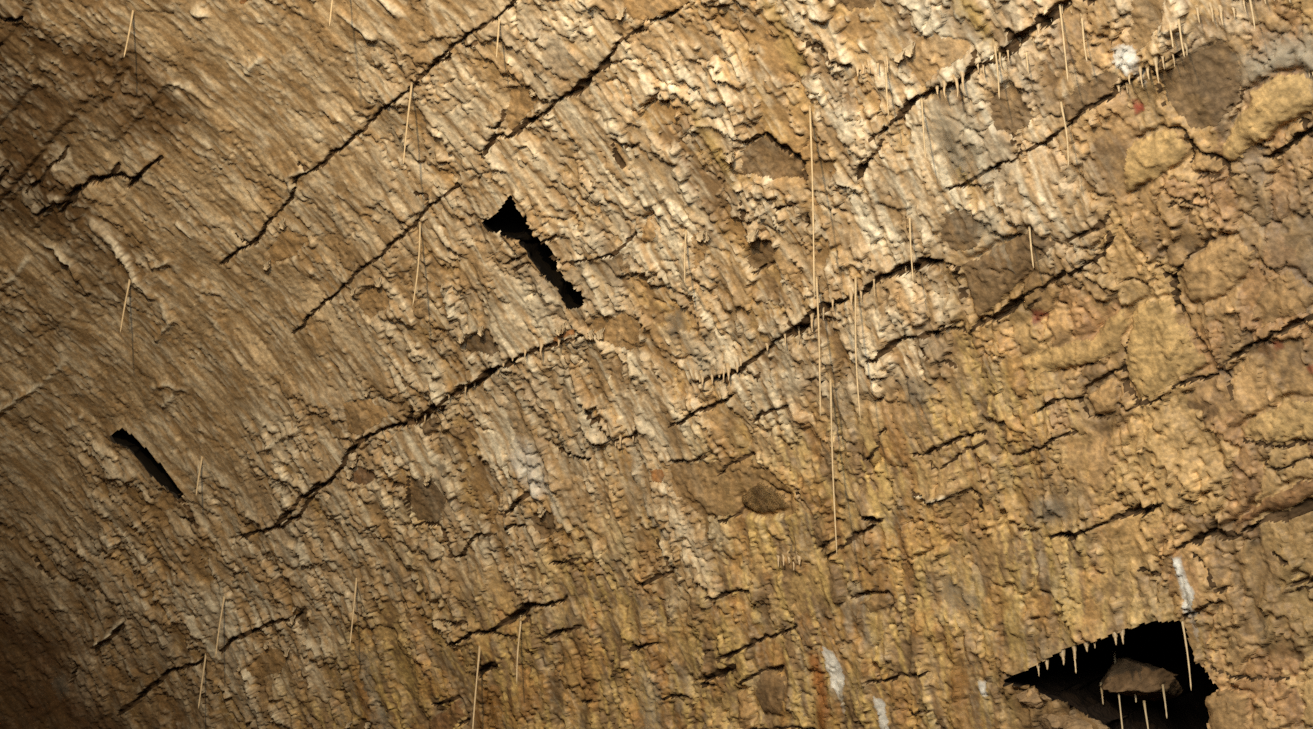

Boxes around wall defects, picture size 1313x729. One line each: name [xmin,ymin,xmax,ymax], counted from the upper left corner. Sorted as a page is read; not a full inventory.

crack [0,16,23,46]
crack [219,0,517,265]
crack [480,1,689,158]
crack [611,142,640,169]
crack [291,182,460,334]
spalling [483,195,643,351]
crack [506,231,637,272]
spalling [112,428,183,498]
crack [240,334,584,540]
crack [392,475,536,558]
crack [549,557,581,565]
spalling [1004,620,1250,729]